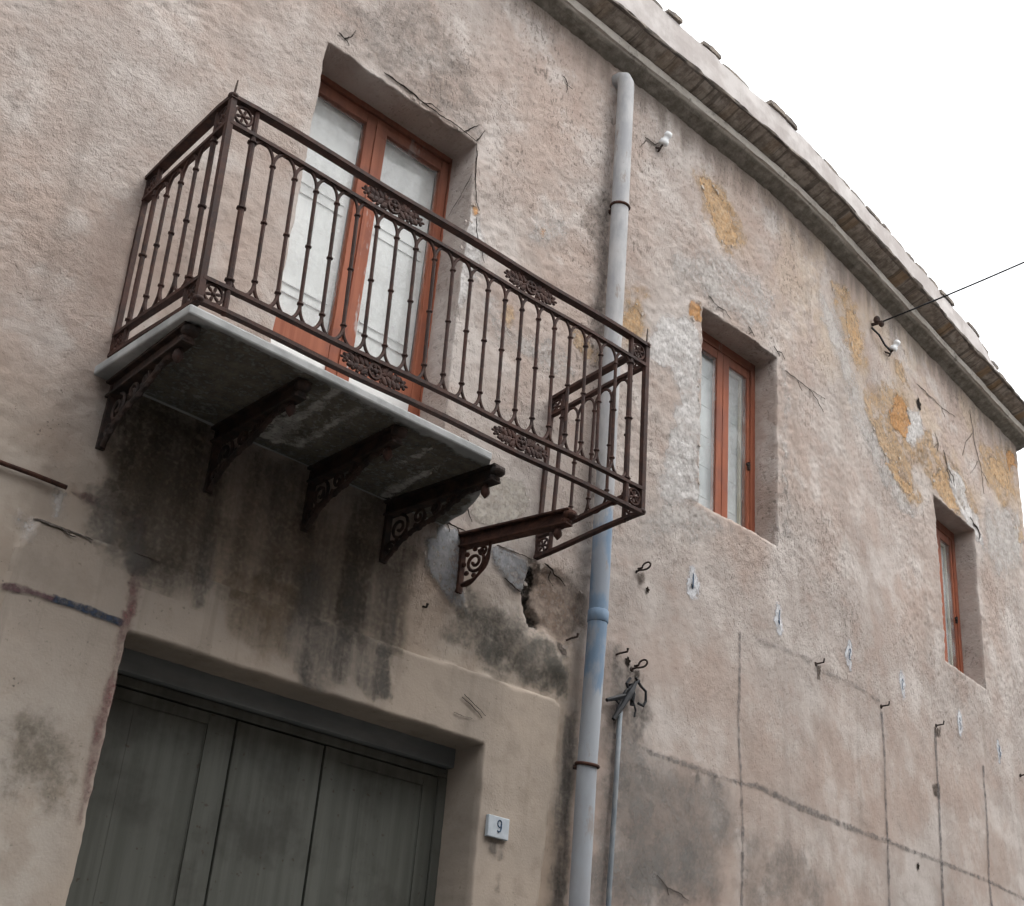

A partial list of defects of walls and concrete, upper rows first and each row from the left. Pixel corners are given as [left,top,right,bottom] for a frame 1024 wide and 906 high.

crack [384,72,485,263]
peeling [700,177,737,248]
leakage [97,327,484,688]
peeling [864,360,913,496]
peeling [933,468,966,514]
crack [917,384,989,493]
peeling [987,450,1017,491]
spalling [520,564,583,649]